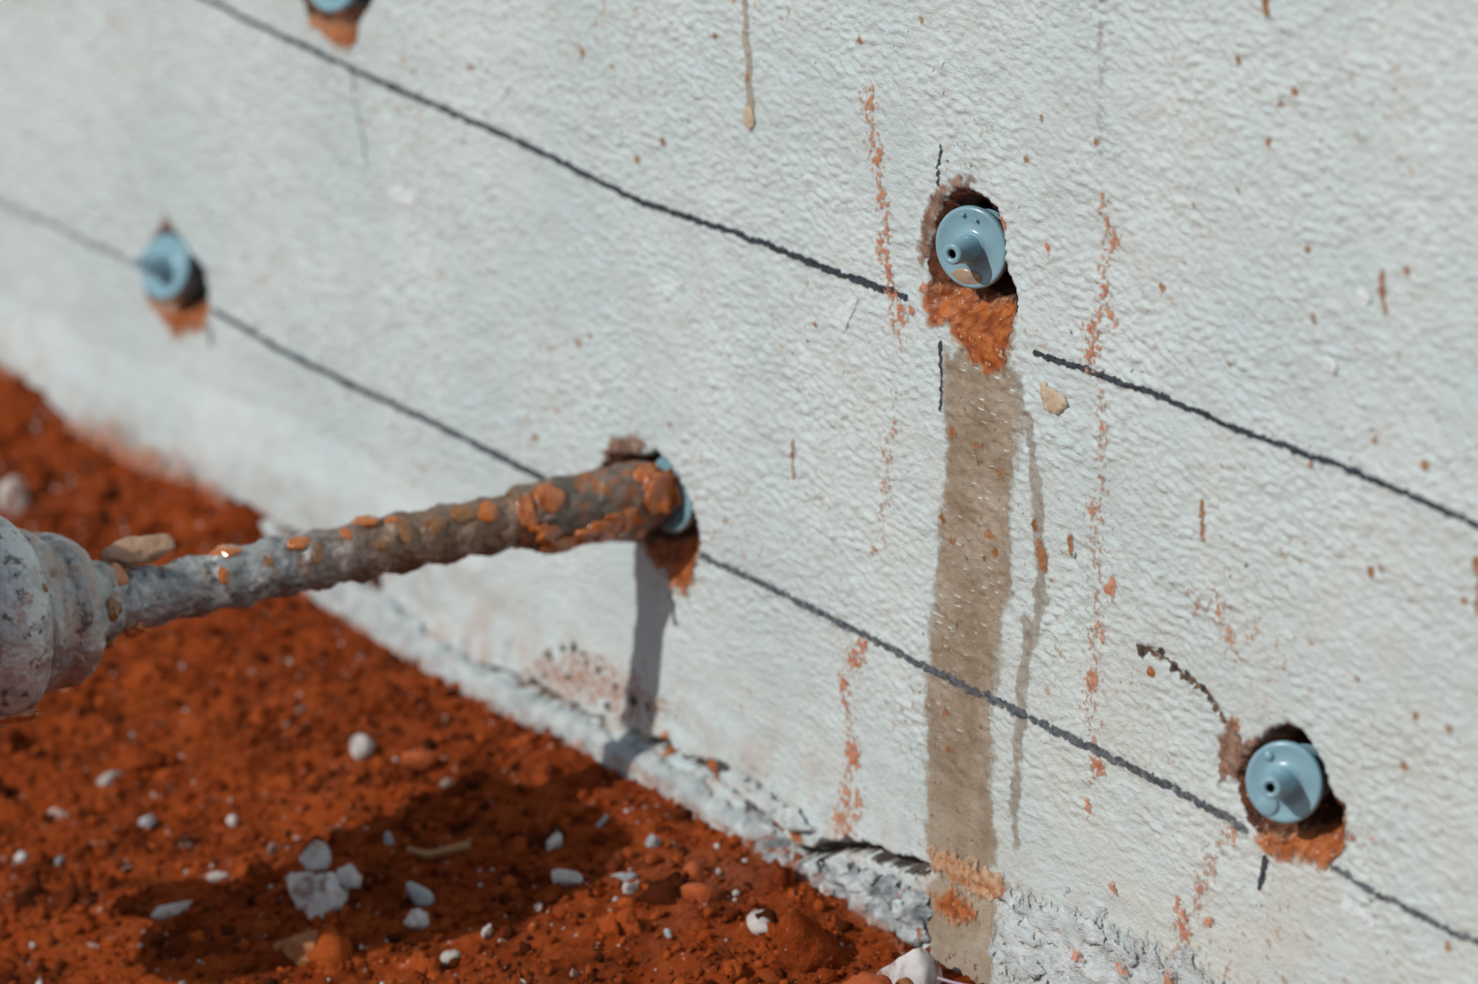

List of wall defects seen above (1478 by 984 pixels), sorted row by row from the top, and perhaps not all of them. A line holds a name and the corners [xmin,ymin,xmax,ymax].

corrosion [308,12,358,52]
corrosion [146,297,212,340]
corrosion [921,283,1017,379]
water stain [1067,179,1121,819]
corrosion [638,525,701,597]
water stain [924,347,1049,984]
crack [1136,643,1233,724]
crack [481,662,932,879]
corrosion [1253,800,1347,871]